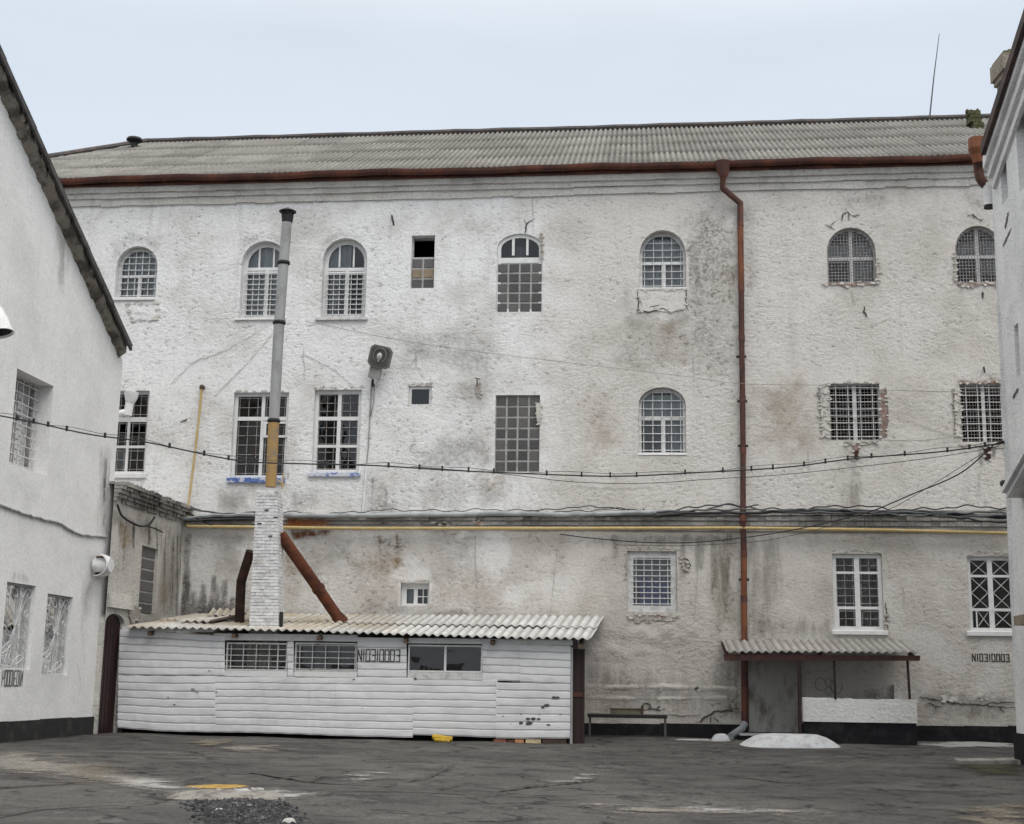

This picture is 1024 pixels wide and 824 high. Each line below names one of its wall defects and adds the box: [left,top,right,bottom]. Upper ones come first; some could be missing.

flaking render [637,288,688,313]
spalling [816,379,889,460]
spalling [951,381,1004,461]
corrosion [286,518,329,539]
water stain [182,579,233,614]